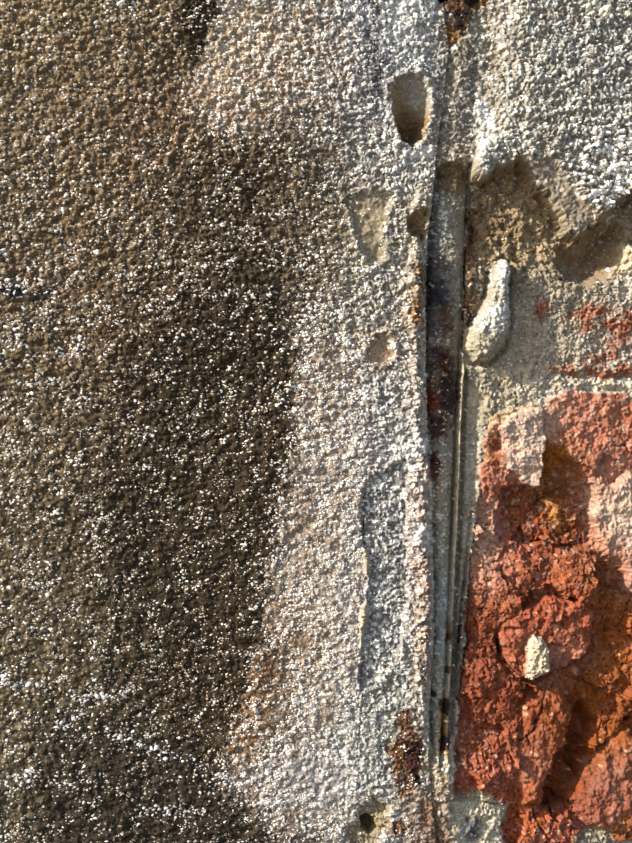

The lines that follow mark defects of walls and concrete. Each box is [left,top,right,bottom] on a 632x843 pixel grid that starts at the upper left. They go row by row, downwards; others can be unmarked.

corrosion [443,0,490,44]
flaking render [389,76,431,147]
spalling [467,153,632,309]
corrosion [410,248,459,440]
leakage [0,0,344,843]
corrosion [427,450,443,483]
spalling [495,408,596,551]
crack [496,634,521,677]
crack [519,704,543,752]
corrosion [385,708,445,843]
spalling [345,798,390,843]
crack [533,798,554,843]